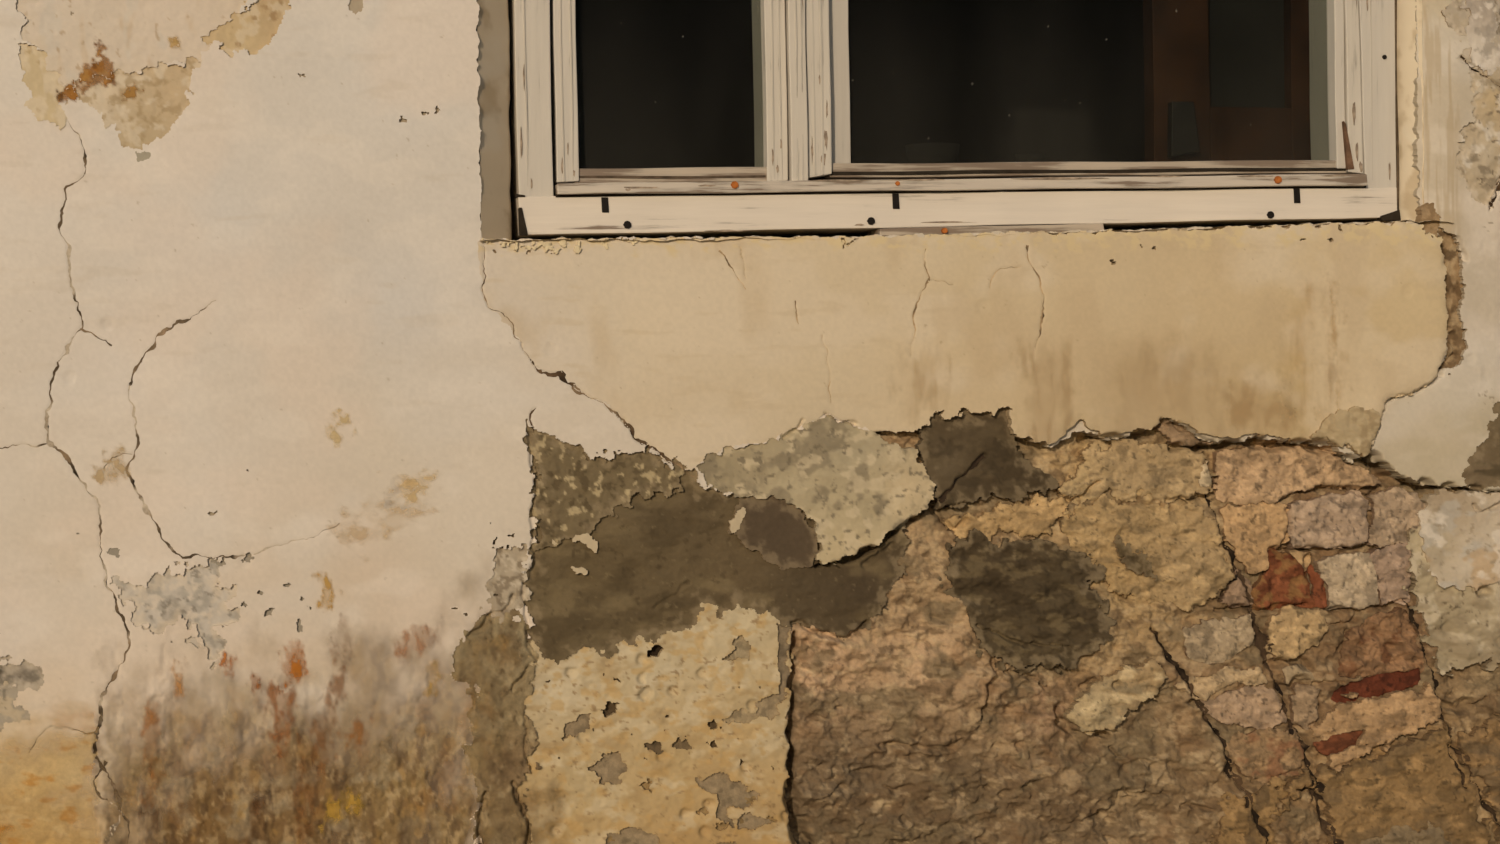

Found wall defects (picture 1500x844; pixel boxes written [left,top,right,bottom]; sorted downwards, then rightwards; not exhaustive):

corrosion [57,44,144,102]
peeling [16,0,291,162]
peeling [1441,0,1500,208]
crack [1489,176,1500,210]
crack [0,123,340,844]
peeling [0,655,44,732]
peeling [107,548,275,670]
leakage [0,651,490,844]
flaking render [451,406,1500,844]
crack [1150,627,1270,844]
crack [1204,490,1344,844]
crack [1402,599,1500,826]